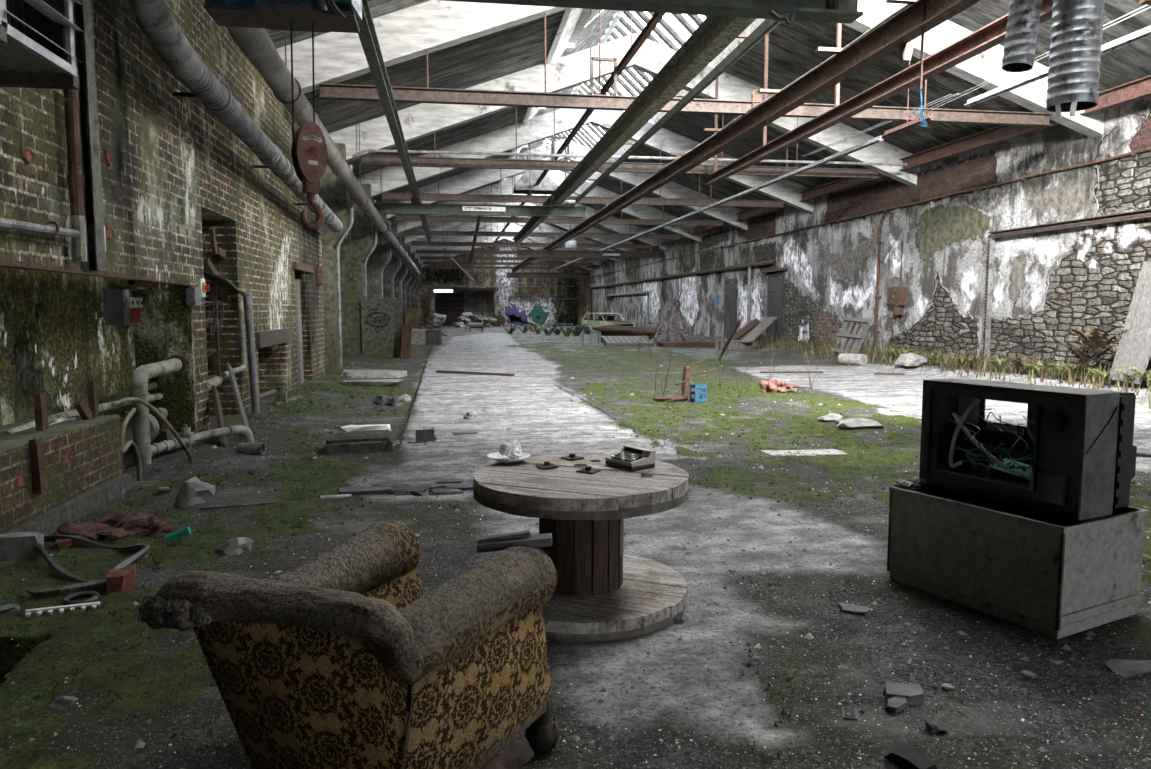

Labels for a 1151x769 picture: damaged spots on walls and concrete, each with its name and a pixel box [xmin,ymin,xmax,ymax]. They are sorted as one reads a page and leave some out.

leakage [179,103,195,236]
flaking render [823,101,1151,376]